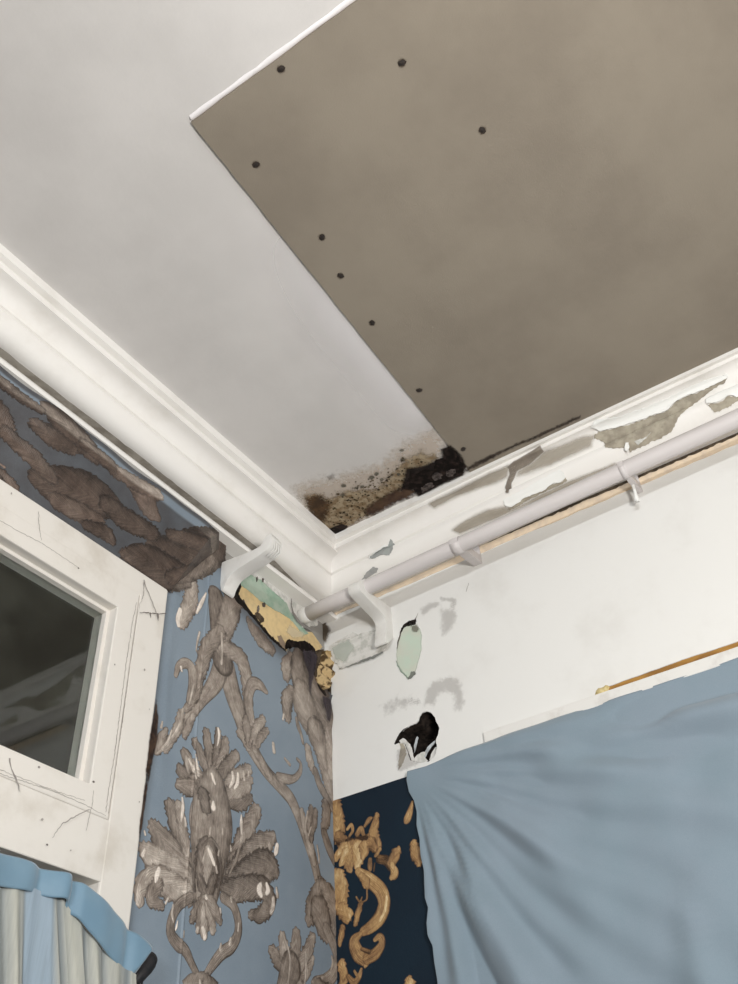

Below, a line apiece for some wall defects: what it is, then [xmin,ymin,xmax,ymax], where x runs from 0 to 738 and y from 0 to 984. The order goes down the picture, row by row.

peeling [590,374,738,452]
leakage [304,449,437,534]
spalling [402,446,466,496]
flaking render [480,433,738,553]
peeling [362,539,395,580]
spalling [234,572,322,653]
peeling [396,614,422,679]
spalling [394,712,439,770]